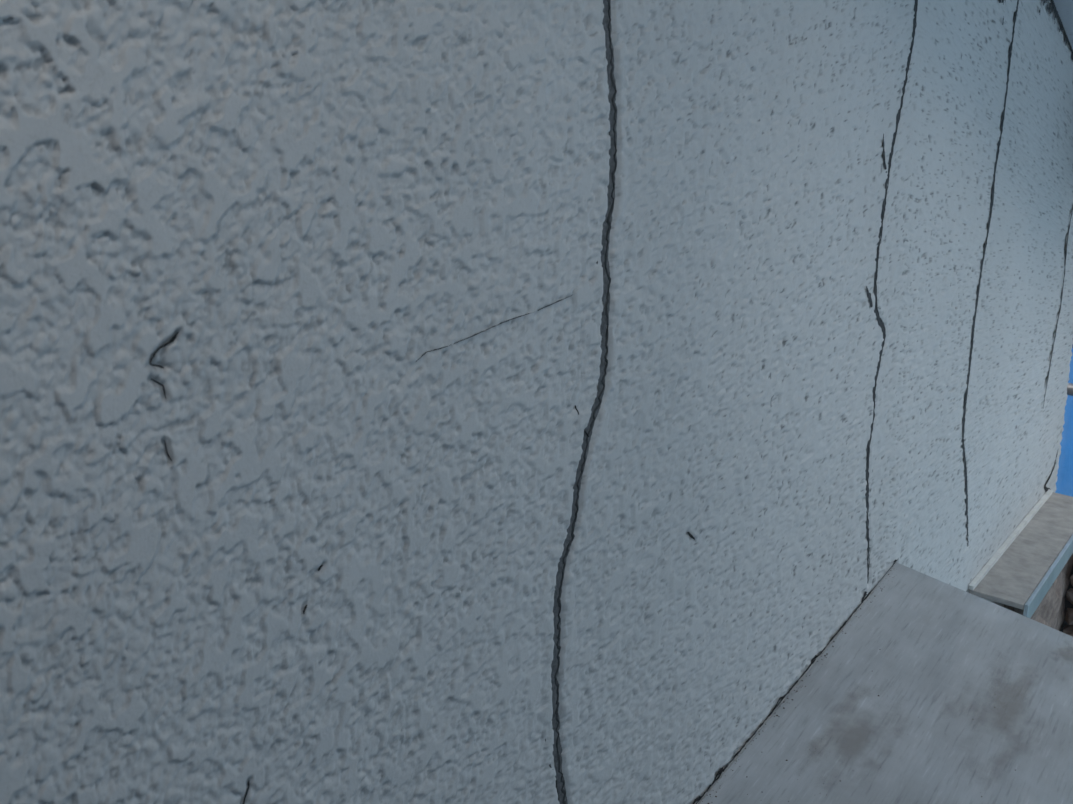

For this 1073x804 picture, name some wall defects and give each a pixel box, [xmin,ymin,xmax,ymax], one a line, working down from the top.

crack [416,295,572,362]
crack [545,0,617,804]
crack [693,0,918,804]
crack [961,0,1019,547]
crack [1044,452,1058,492]
crack [1043,208,1073,407]